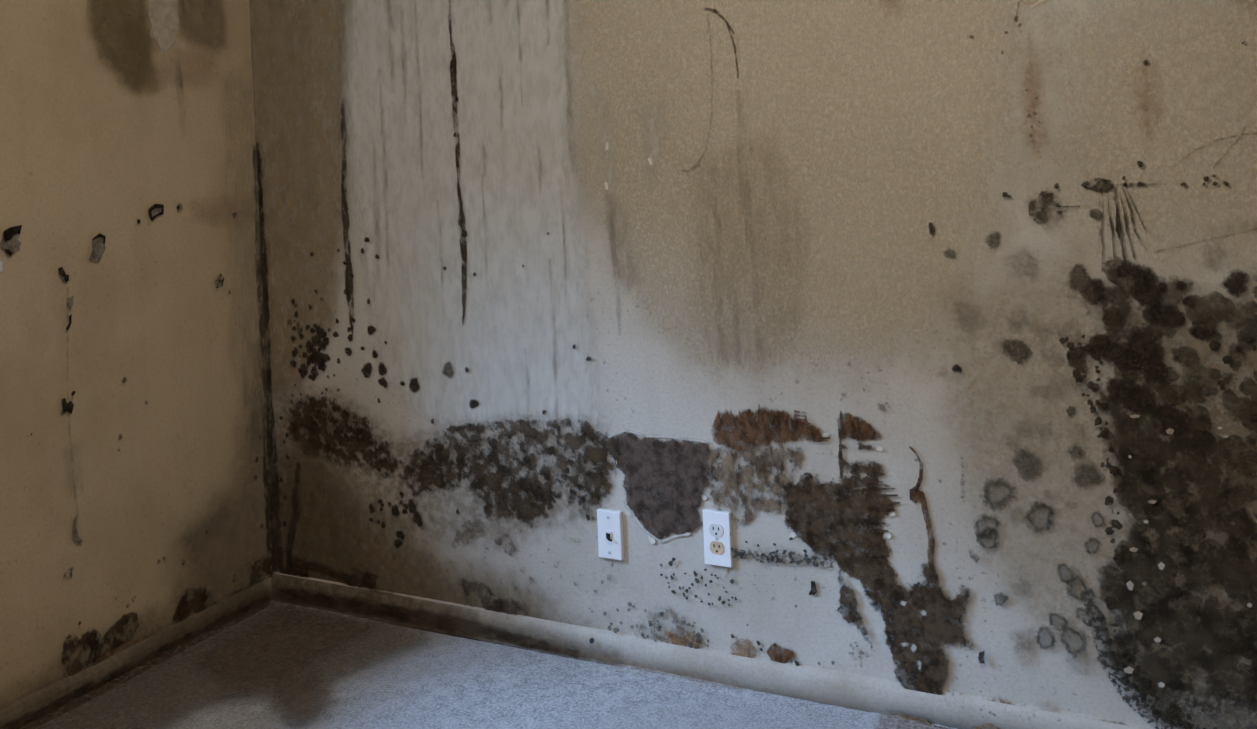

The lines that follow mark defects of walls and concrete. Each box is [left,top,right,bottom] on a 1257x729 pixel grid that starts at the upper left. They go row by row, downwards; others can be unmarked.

water stain [570,0,1038,365]
water stain [0,0,614,729]
water stain [952,0,1257,729]
water stain [591,602,709,649]
water stain [660,558,737,606]
peeling [605,405,973,695]
water stain [876,712,941,729]